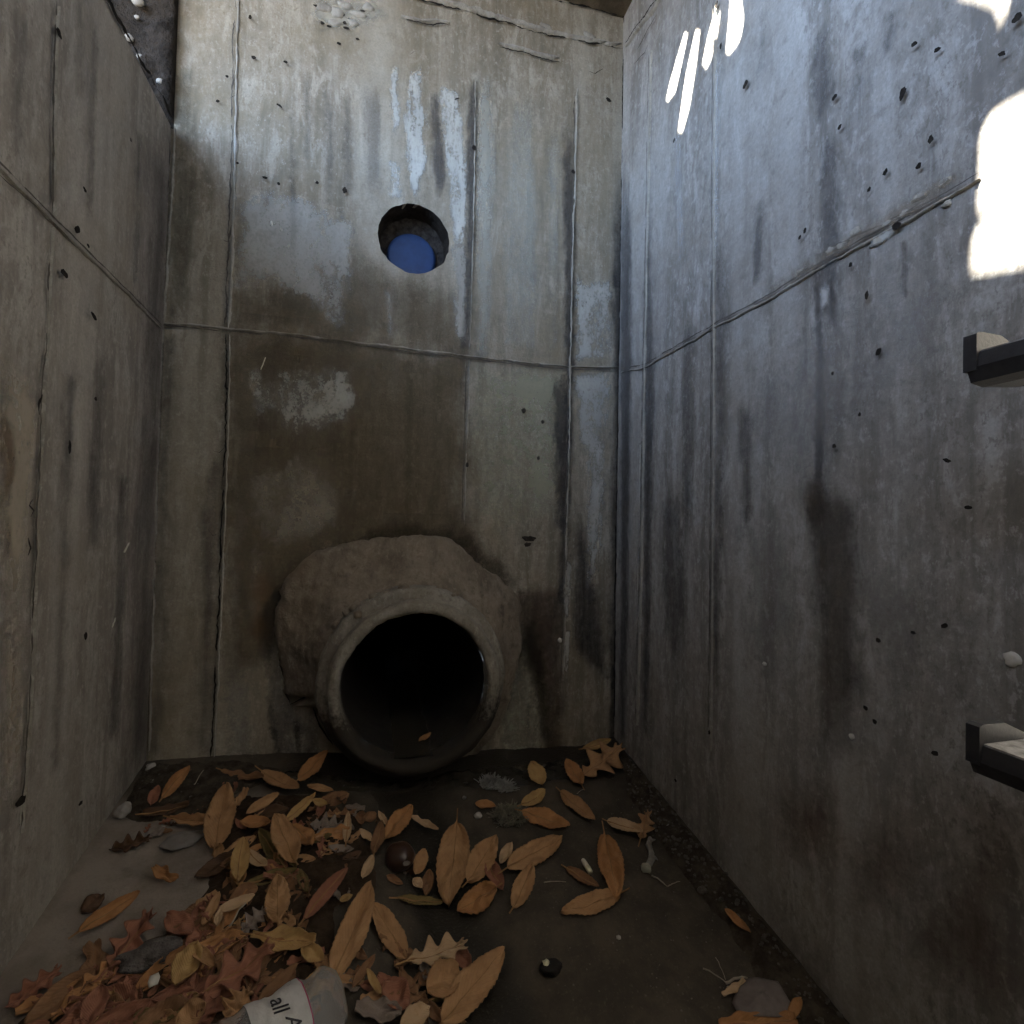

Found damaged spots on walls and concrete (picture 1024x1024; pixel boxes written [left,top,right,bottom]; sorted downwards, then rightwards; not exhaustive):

damp [389,67,495,349]
peeling [869,190,929,249]
damp [476,147,653,750]
damp [810,282,855,702]